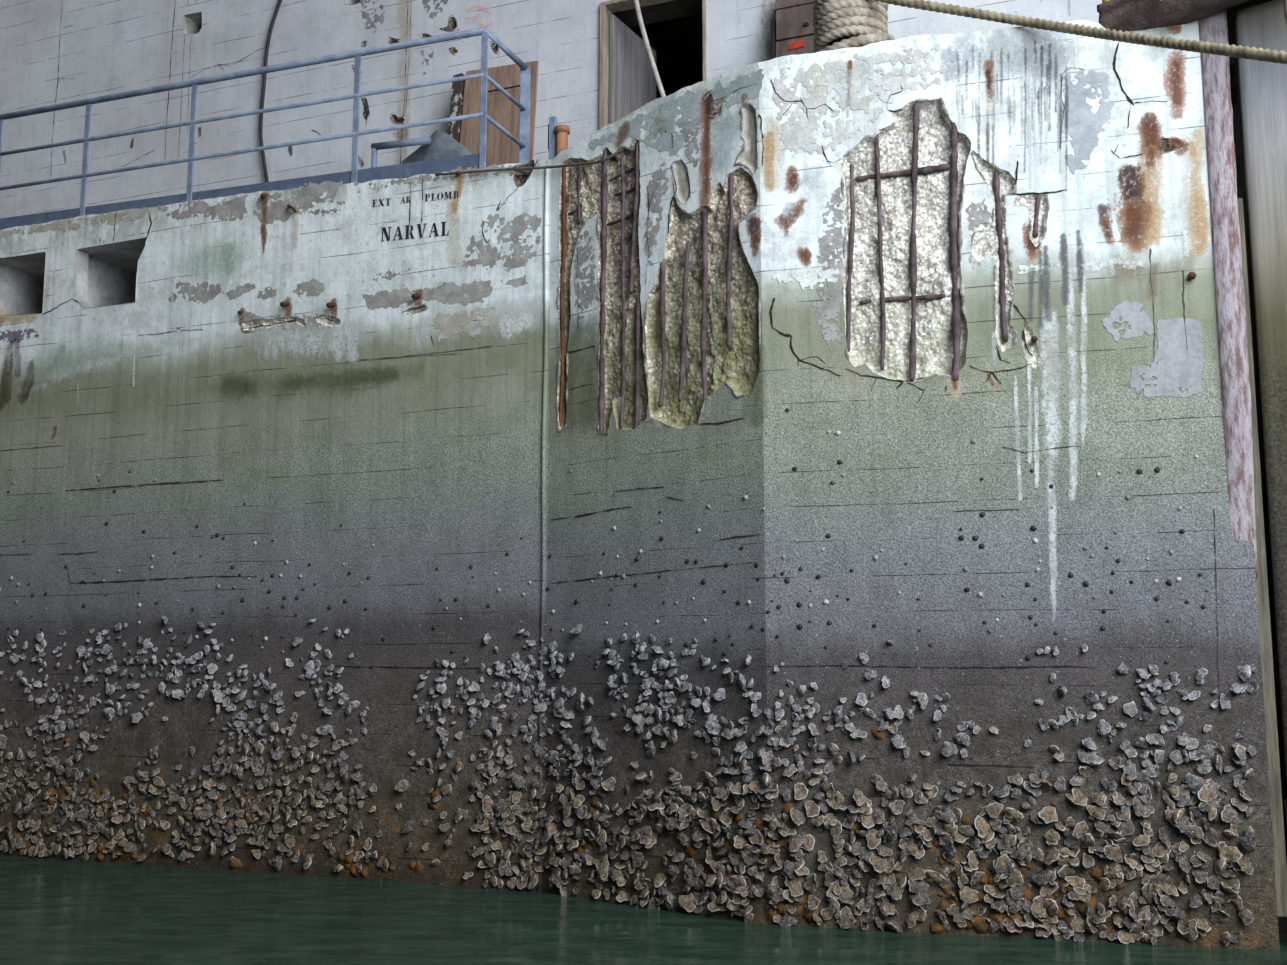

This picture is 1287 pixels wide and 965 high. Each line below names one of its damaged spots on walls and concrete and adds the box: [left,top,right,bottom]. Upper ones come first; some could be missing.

peeling [419,0,459,74]
rust [699,90,725,206]
peeling [1061,69,1114,174]
crack [1060,42,1167,158]
rust [1098,51,1203,255]
rust [261,192,269,253]
spalling [0,44,1064,435]
rust [1189,189,1209,253]
leakage [0,340,137,410]
crack [769,298,1033,402]
leakage [1014,230,1156,613]
peeling [1102,301,1204,398]